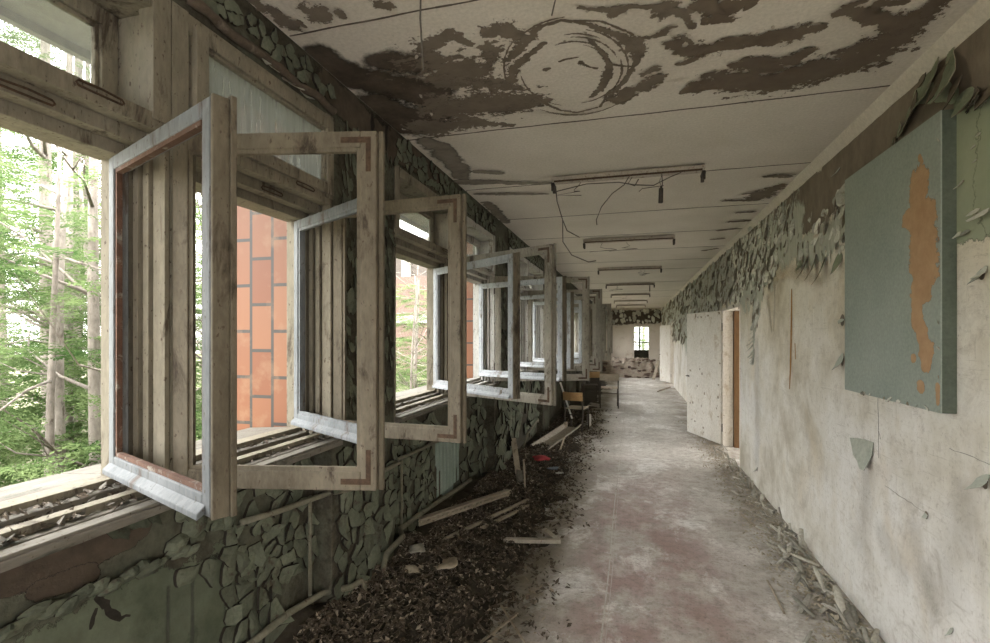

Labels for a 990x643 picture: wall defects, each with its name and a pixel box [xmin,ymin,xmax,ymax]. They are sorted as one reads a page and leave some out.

peeling [202,0,952,271]
spalling [605,19,990,365]
peeling [497,263,508,388]
peeling [902,154,940,413]
peeling [290,457,313,466]
peeling [850,438,874,471]
peeling [0,489,319,643]